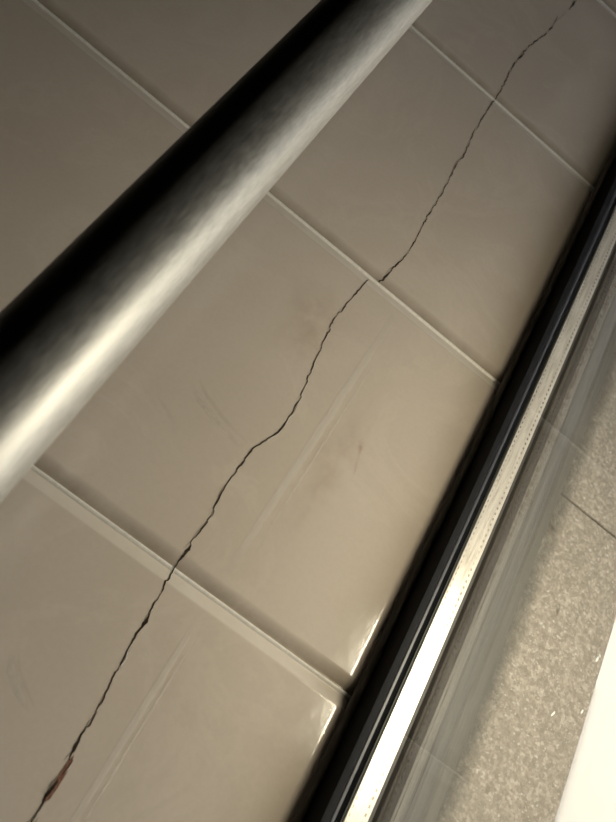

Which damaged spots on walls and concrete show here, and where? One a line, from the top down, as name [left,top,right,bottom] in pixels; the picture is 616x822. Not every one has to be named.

crack [64,1,576,760]
crack [27,787,52,822]